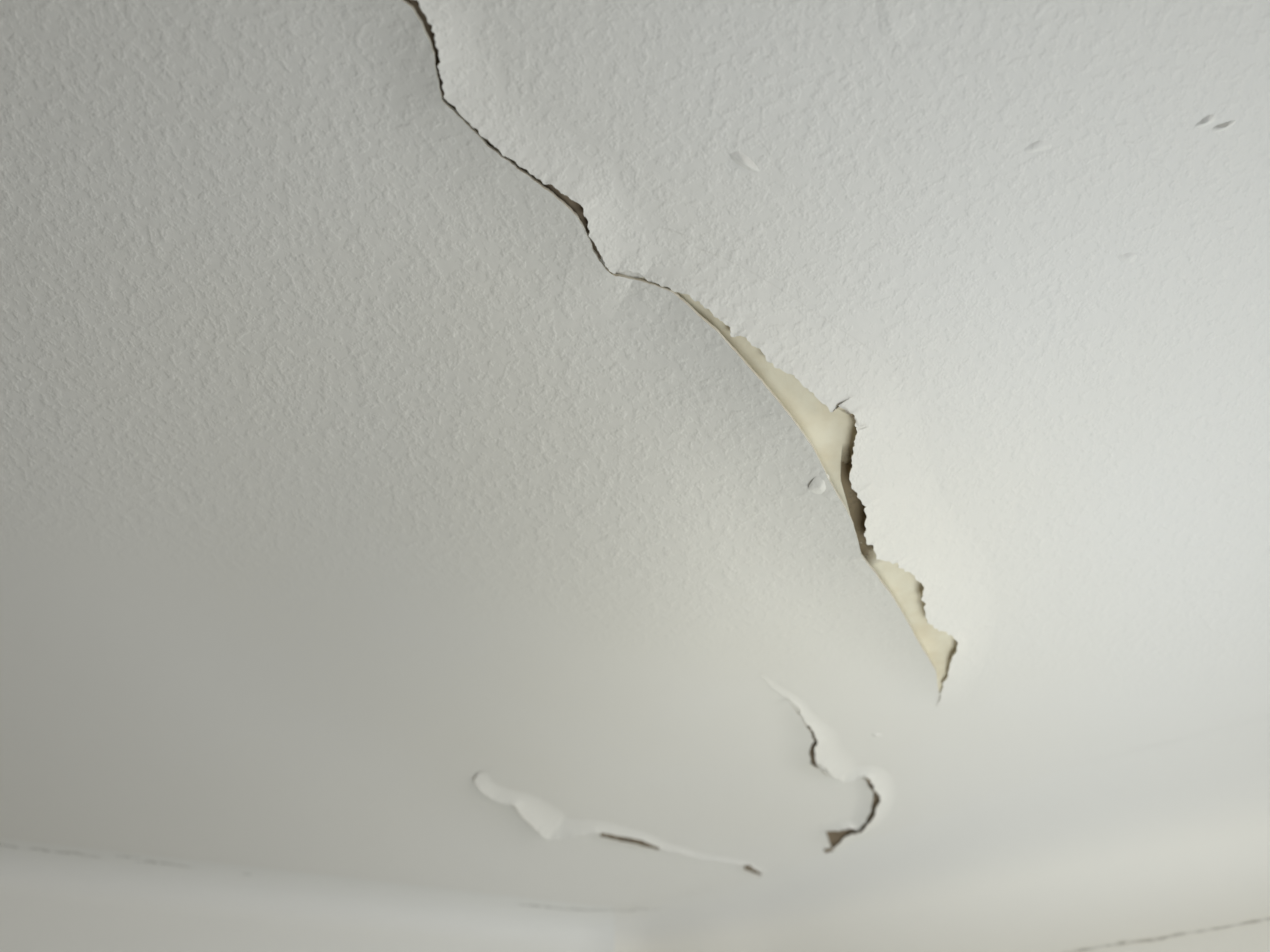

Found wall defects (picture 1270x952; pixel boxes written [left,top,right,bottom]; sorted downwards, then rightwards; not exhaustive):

peeling [585,244,996,711]
peeling [474,772,769,878]